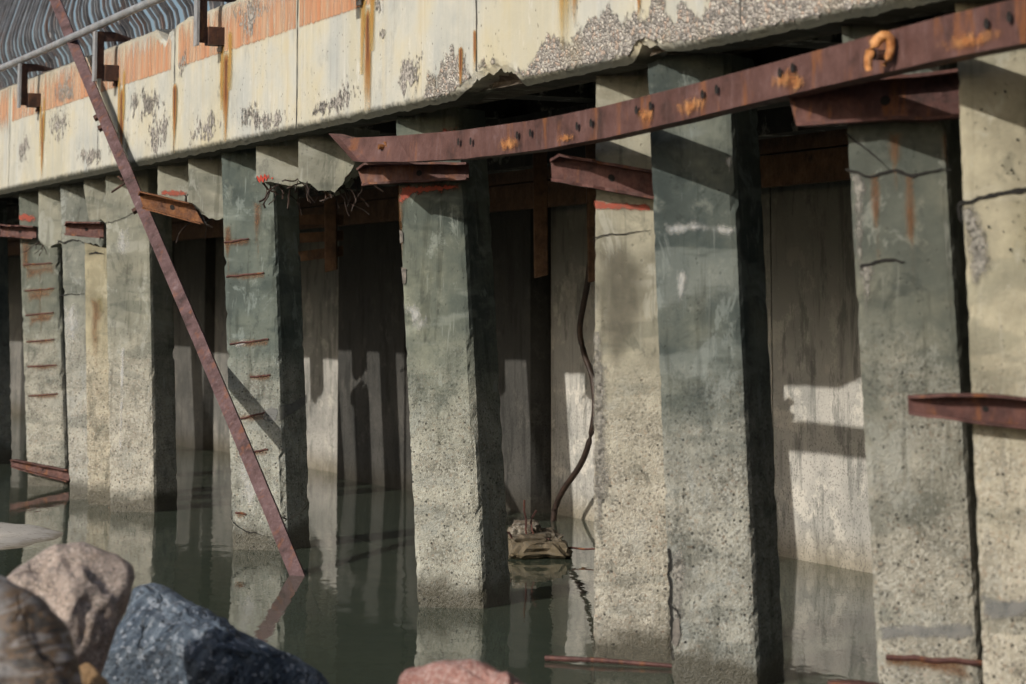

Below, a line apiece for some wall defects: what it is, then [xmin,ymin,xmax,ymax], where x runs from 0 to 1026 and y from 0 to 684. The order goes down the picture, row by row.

rust [117,72,125,144]
rust [220,33,232,135]
rust [360,0,374,103]
spalling [398,45,495,98]
rust [459,31,476,83]
spalling [481,0,884,92]
rust [680,100,703,114]
rust [778,70,800,89]
crack [845,132,951,178]
spalling [259,171,383,216]
crack [957,188,1026,224]
crack [667,548,681,661]